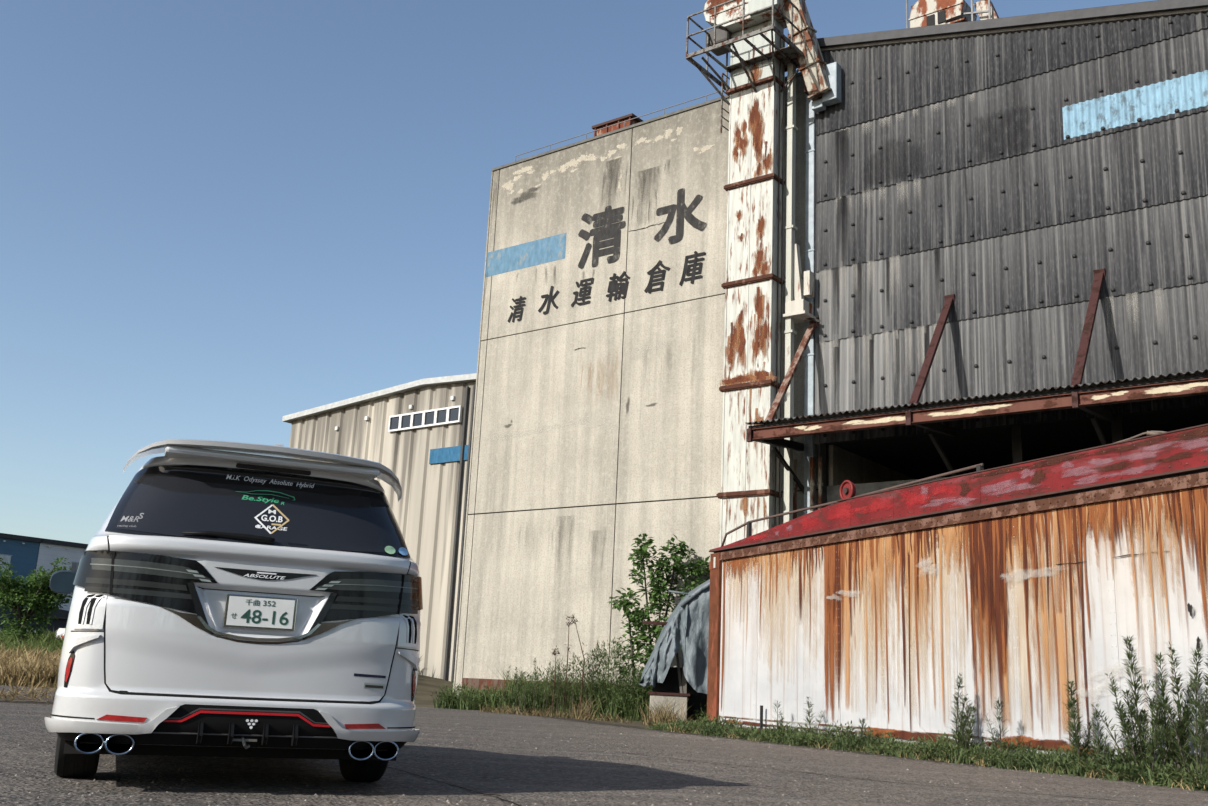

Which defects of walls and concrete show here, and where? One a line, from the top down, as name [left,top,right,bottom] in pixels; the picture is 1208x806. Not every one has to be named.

rust [706,0,742,14]
rust [749,44,771,81]
rust [733,99,772,177]
peeling [502,126,683,194]
rust [720,210,775,423]
peeling [842,416,905,425]
peeling [929,404,1011,417]
peeling [1091,391,1128,400]
peeling [1146,382,1208,394]
rust [721,486,1208,754]